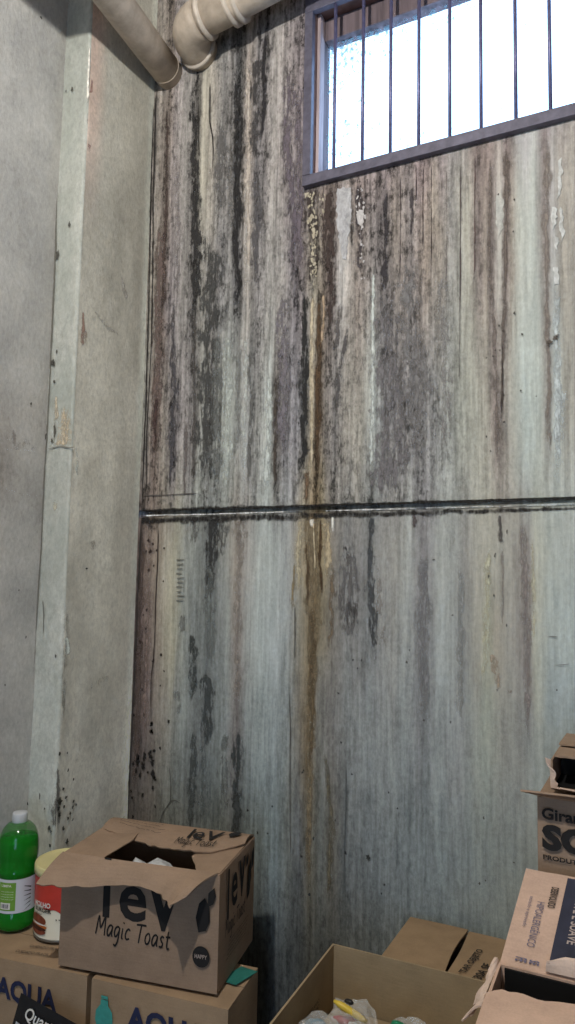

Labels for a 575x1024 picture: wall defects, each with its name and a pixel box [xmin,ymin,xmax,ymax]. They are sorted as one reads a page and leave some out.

leakage [151,36,310,493]
leakage [282,75,348,415]
corrosion [305,295,325,502]
peeling [305,187,366,285]
leakage [130,153,575,832]
peeling [551,157,565,249]
corrosion [291,518,335,890]